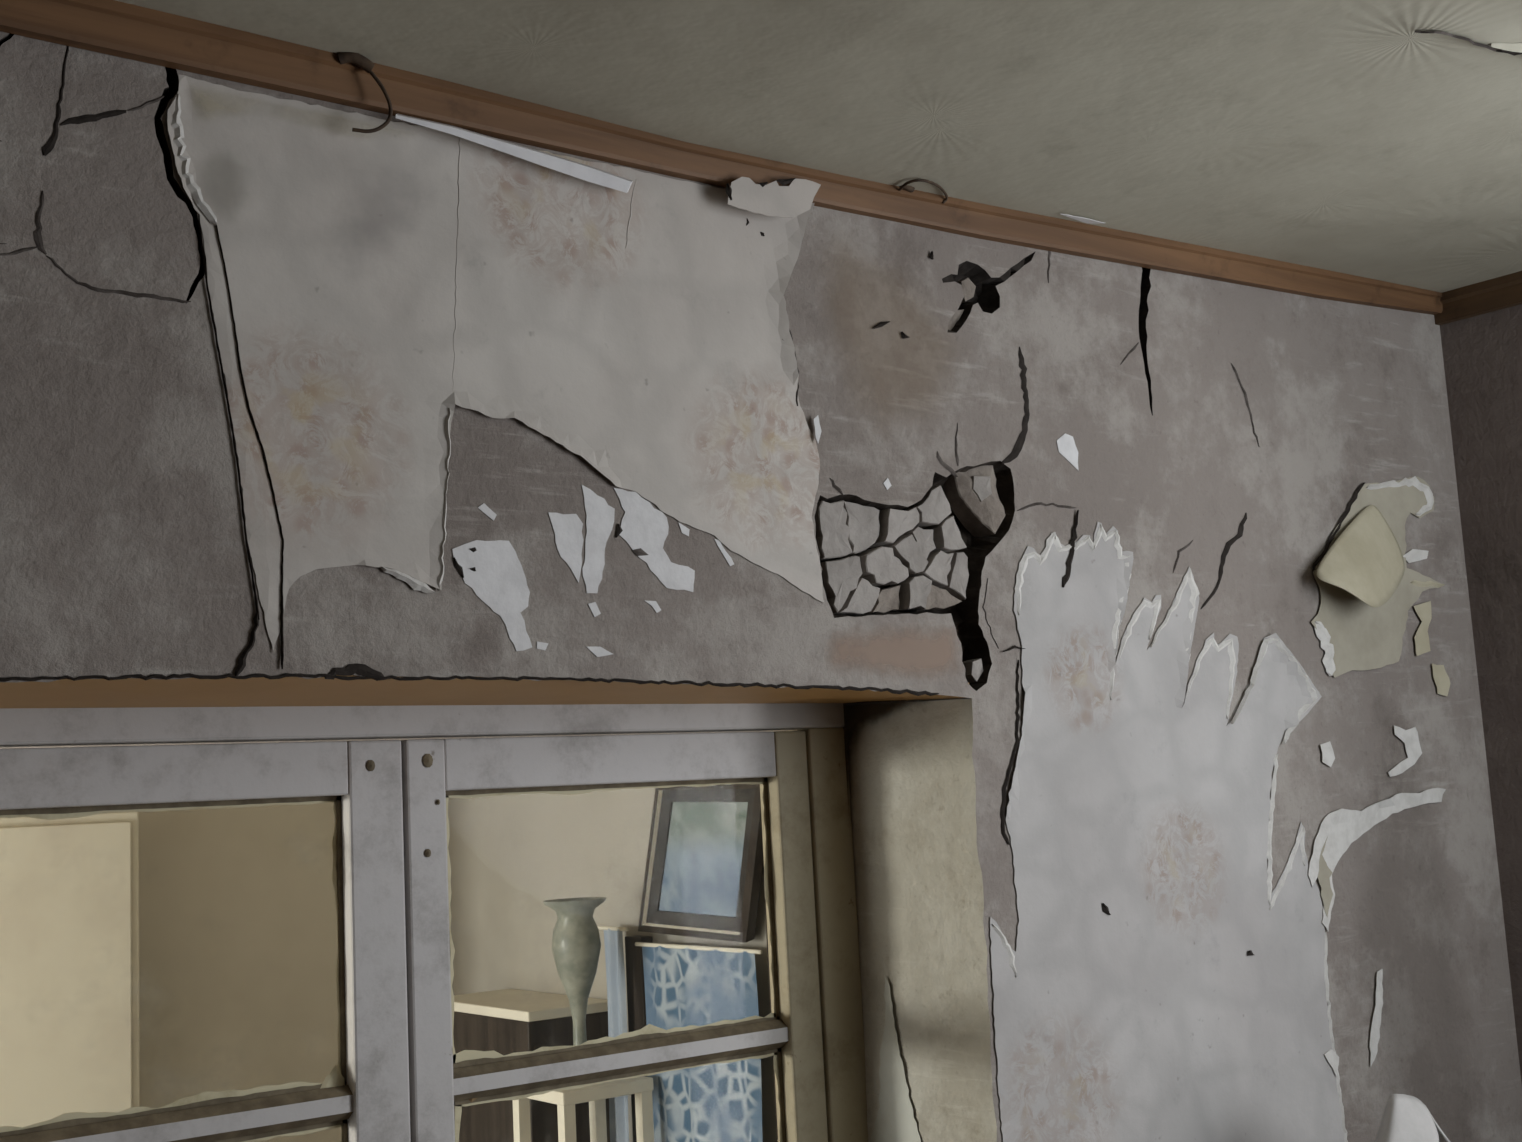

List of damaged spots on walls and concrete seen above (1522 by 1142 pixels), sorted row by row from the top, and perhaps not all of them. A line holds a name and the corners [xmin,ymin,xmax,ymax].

crack [0,33,14,46]
crack [0,46,939,696]
peeling [813,415,821,443]
peeling [478,503,497,521]
peeling [452,540,548,651]
peeling [548,485,695,617]
peeling [714,539,734,566]
peeling [1311,476,1445,678]